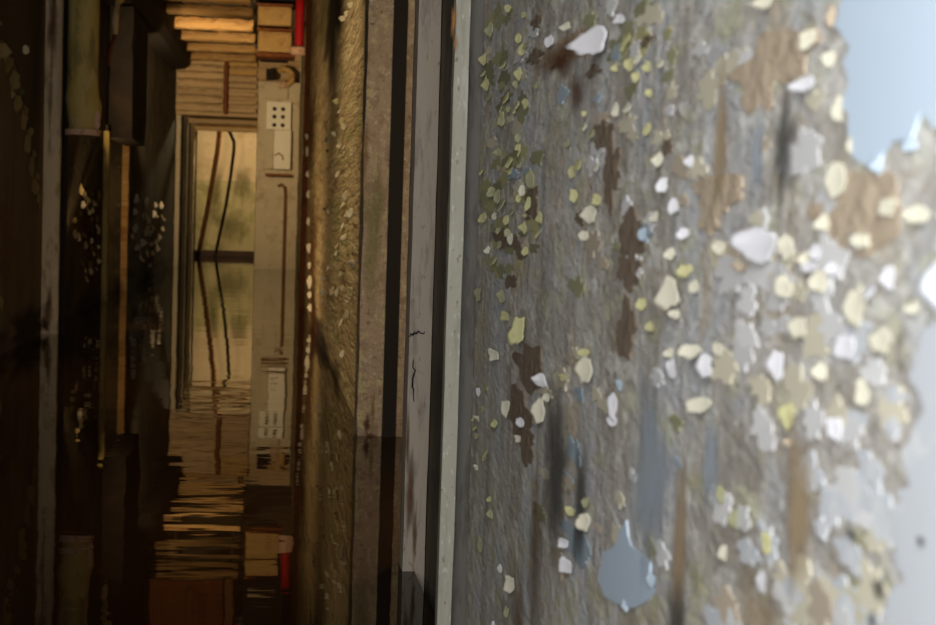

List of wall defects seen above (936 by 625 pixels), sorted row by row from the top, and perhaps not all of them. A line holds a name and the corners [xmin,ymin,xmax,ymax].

peeling [0,0,43,214]
peeling [469,0,936,625]